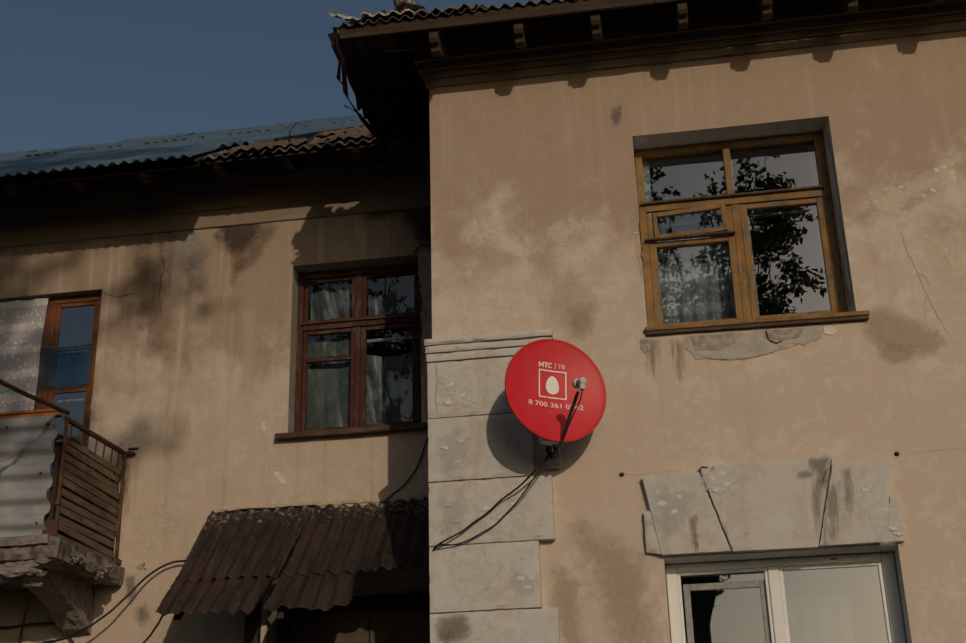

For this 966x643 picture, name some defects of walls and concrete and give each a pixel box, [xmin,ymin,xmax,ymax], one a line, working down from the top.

leakage [223,224,257,251]
spalling [685,325,838,360]
crack [818,459,832,547]
spalling [0,557,51,588]
spalling [69,550,113,580]